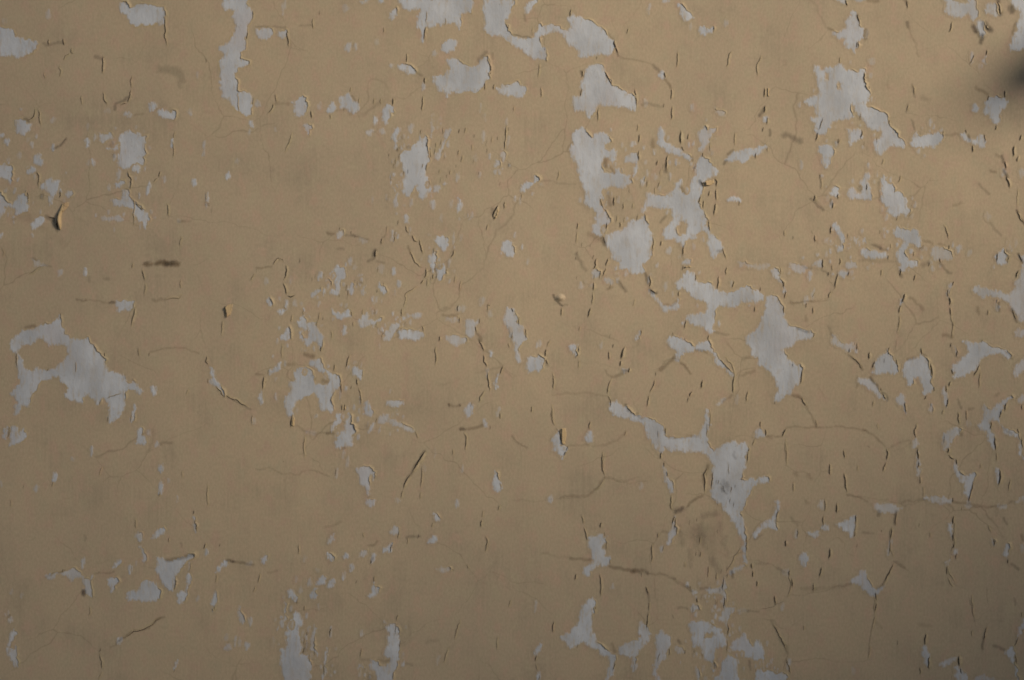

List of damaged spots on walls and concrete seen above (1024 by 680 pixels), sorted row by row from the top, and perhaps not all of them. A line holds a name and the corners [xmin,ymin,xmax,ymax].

crack [974,0,1004,55]
peeling [217,0,1010,406]
crack [983,135,1024,223]
crack [575,222,637,331]
peeling [0,313,162,449]
crack [205,304,257,426]
peeling [256,230,556,511]
crack [607,346,657,407]
peeling [607,398,782,565]
crack [829,423,926,495]
peeling [829,236,1024,587]
peeling [531,596,791,680]